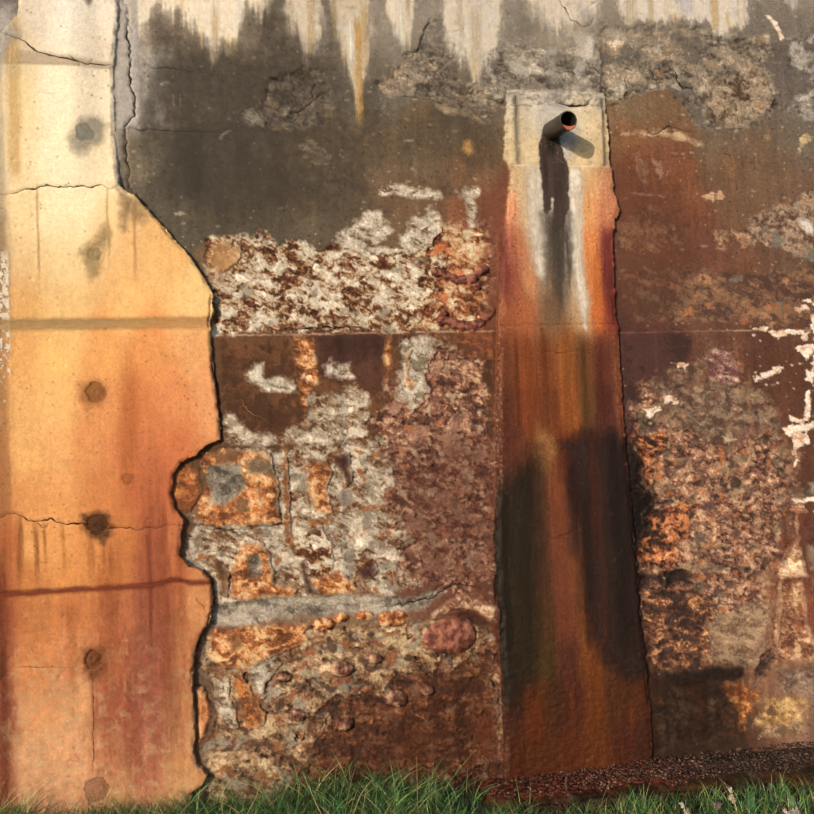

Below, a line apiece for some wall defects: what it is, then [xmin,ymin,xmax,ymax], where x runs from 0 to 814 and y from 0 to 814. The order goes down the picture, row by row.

water stain [71,119,103,150]
crack [0,19,232,236]
spalling [241,61,339,167]
water stain [113,0,762,206]
water stain [527,105,588,329]
spalling [373,15,814,138]
crack [2,513,180,531]
rust [0,214,221,814]
spalling [171,182,504,808]
rust [493,166,654,779]
water stain [561,434,658,676]
spalling [617,187,814,741]